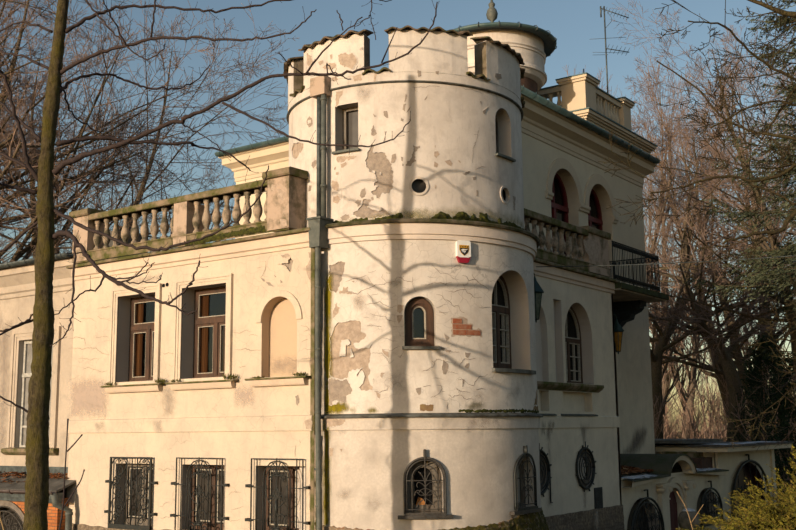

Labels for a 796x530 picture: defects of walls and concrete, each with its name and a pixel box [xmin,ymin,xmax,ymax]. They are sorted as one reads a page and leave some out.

flaking render [306,52,363,107]
flaking render [292,142,304,160]
flaking render [331,110,421,221]
flaking render [278,253,294,272]
flaking render [328,261,386,406]
crack [339,265,489,362]
crack [416,345,488,408]
flaking render [440,316,482,375]